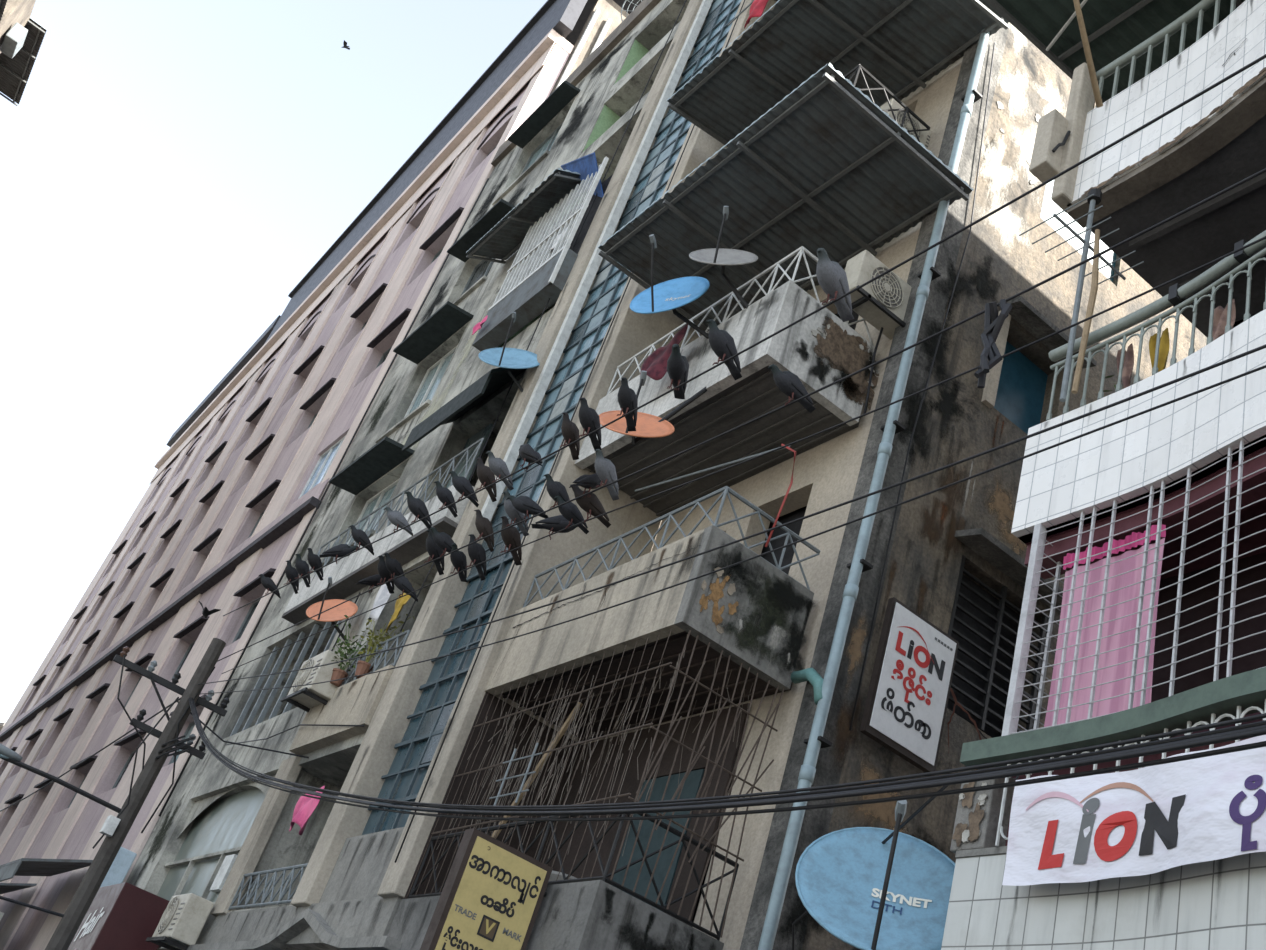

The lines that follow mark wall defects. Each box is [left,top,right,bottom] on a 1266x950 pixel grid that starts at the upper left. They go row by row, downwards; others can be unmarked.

water stain [1011,25,1027,52]
water stain [980,70,1062,245]
water stain [796,341,878,398]
flaking render [699,567,738,634]
water stain [711,543,814,672]
flaking render [952,769,988,847]